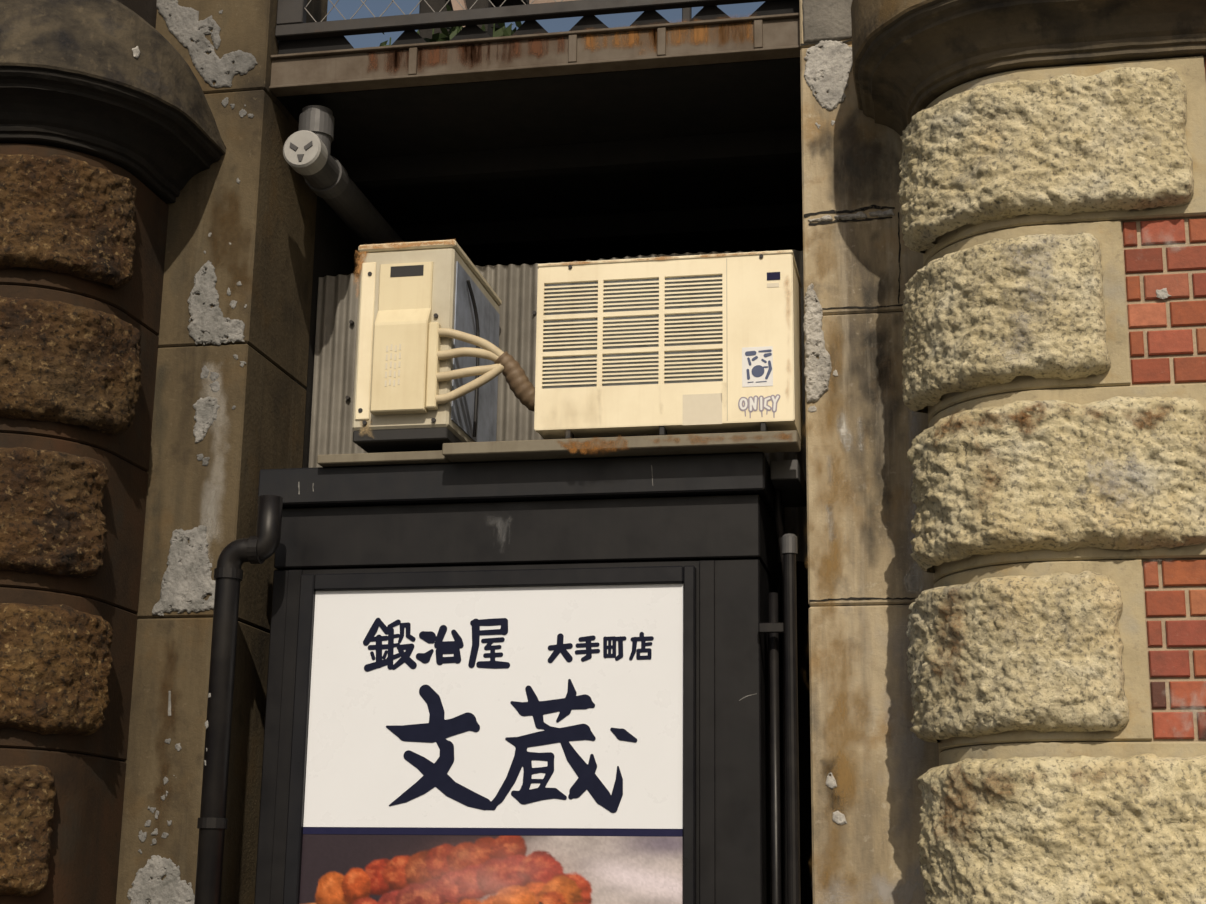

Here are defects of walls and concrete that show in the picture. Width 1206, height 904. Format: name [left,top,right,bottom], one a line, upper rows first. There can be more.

peeling [156,0,258,118]
rust [369,43,490,72]
rust [585,20,754,51]
peeling [804,40,853,128]
peeling [187,233,247,367]
peeling [803,283,838,412]
peeling [193,366,236,466]
water stain [819,413,851,588]
peeling [152,525,215,616]
water stain [827,672,864,812]
peeling [127,775,195,904]